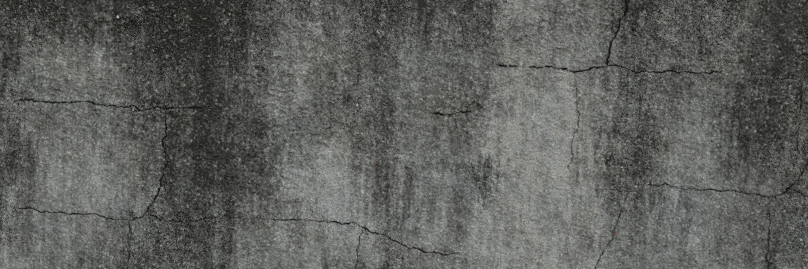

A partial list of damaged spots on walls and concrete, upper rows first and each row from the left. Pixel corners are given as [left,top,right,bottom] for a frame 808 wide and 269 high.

damp [0,0,310,269]
crack [0,98,458,269]
damp [320,0,498,237]
crack [495,0,722,170]
crack [584,74,808,269]
damp [598,0,808,269]